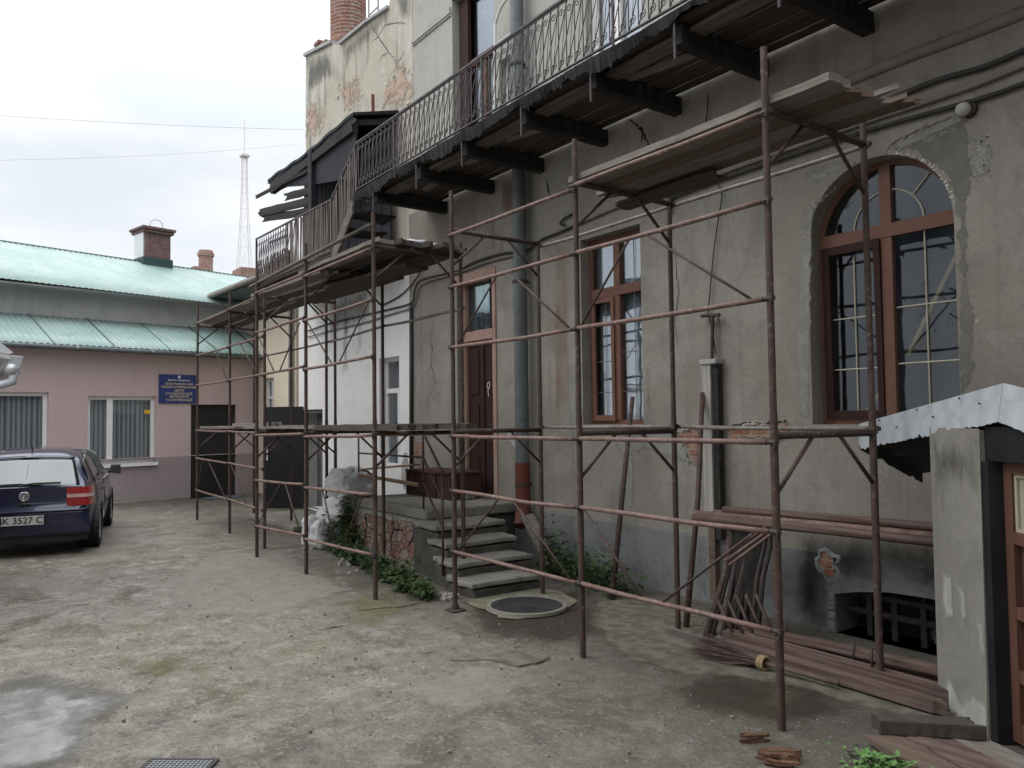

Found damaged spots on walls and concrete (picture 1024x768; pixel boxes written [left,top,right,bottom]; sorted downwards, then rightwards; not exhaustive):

crack [370,22,405,74]
flaking render [305,100,324,138]
crack [629,119,650,145]
flaking render [814,546,842,585]